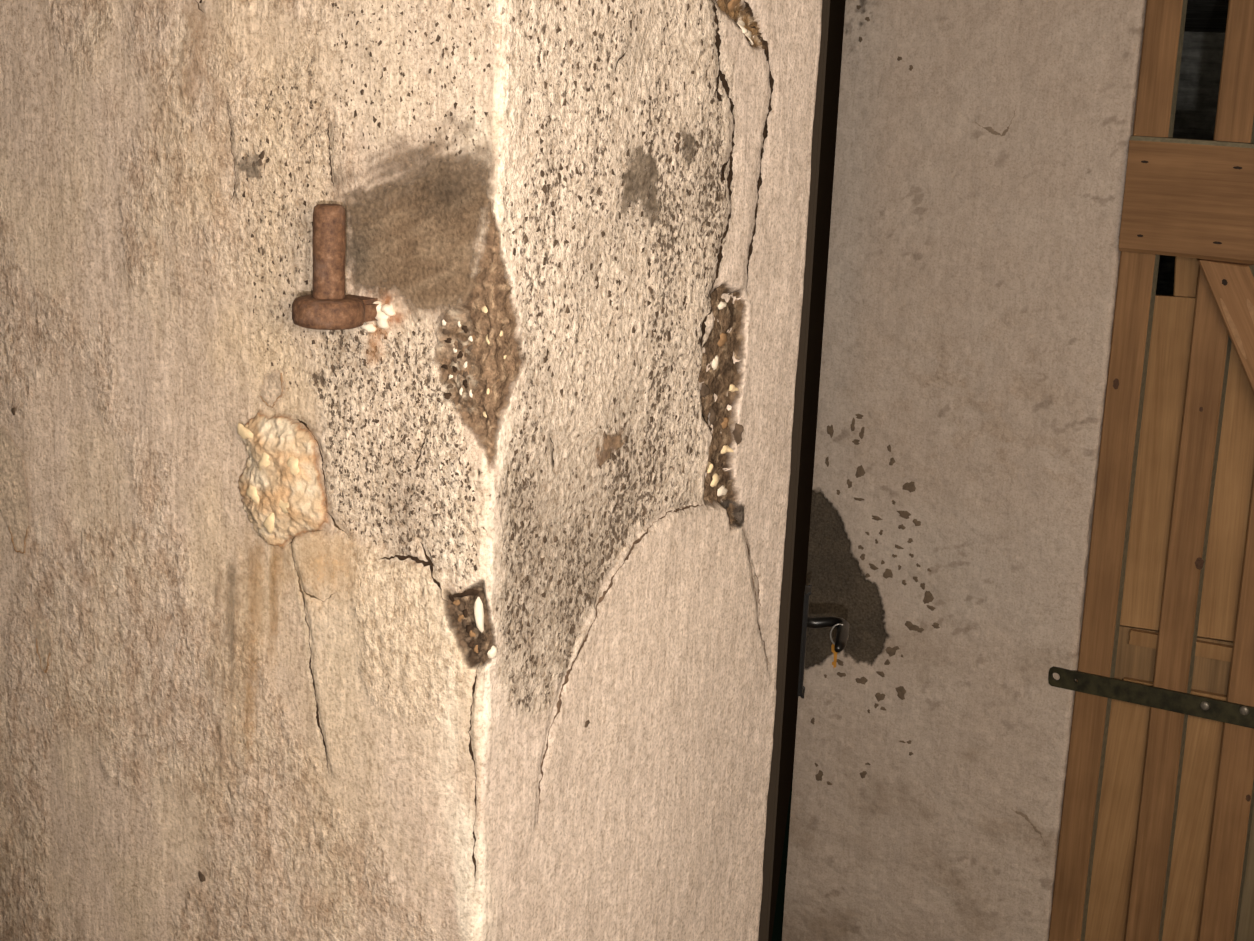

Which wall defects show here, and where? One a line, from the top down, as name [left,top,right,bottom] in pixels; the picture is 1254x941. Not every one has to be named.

spalling [714,0,761,48]
peeling [621,147,661,226]
peeling [675,131,696,163]
peeling [345,143,524,464]
peeling [596,431,623,466]
spalling [697,284,745,528]
crack [287,417,351,774]
spalling [445,582,497,667]
crack [537,504,706,823]
crack [743,530,768,666]